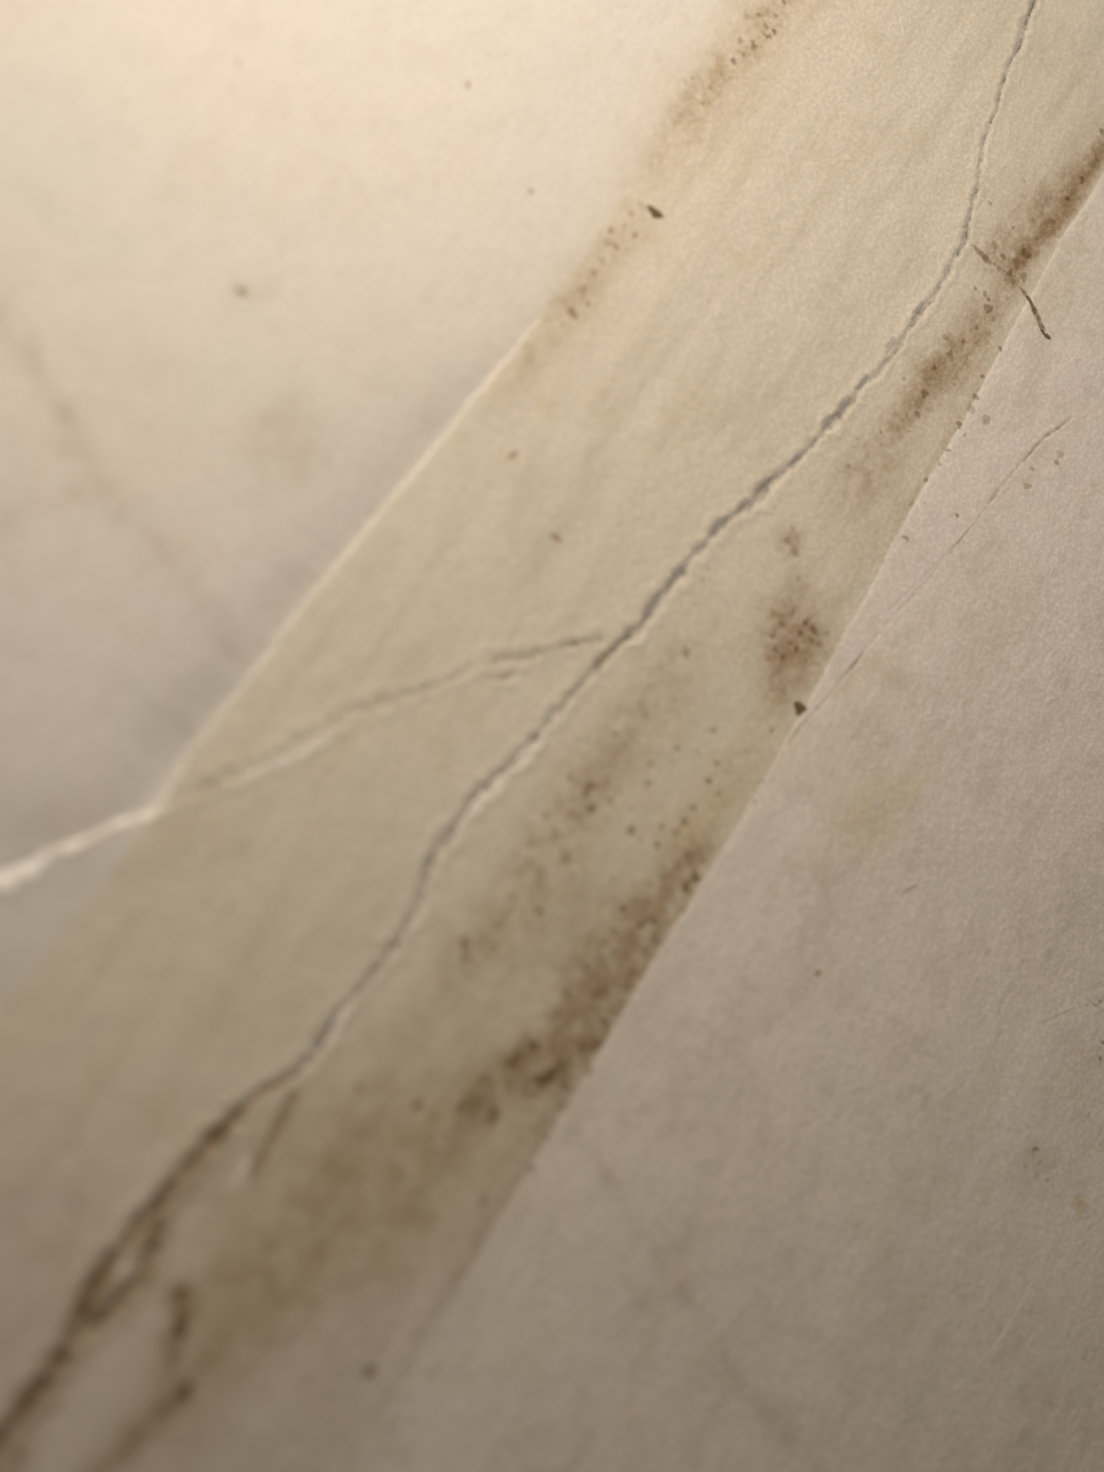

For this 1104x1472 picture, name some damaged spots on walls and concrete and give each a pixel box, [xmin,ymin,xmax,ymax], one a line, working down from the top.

crack [576,376,865,687]
crack [0,763,191,892]
crack [232,733,336,788]
crack [421,735,546,872]
crack [321,971,371,1048]
crack [112,1259,131,1282]